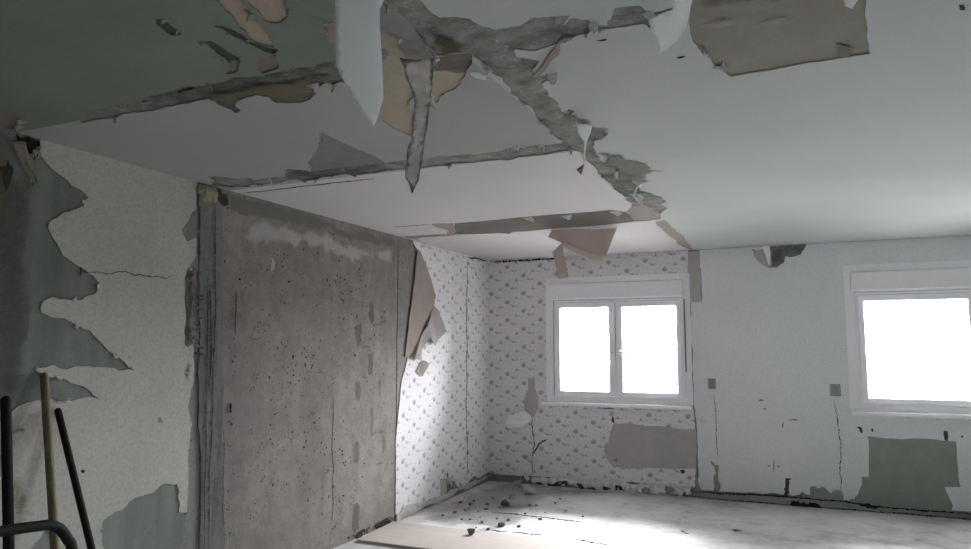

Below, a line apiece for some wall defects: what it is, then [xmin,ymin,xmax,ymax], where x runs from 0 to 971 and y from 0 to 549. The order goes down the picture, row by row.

spalling [197,40,242,73]
peeling [218,0,294,74]
peeling [379,0,472,135]
peeling [689,0,869,76]
peeling [0,130,134,410]
crack [80,267,171,279]
peeling [404,223,458,238]
peeling [752,244,806,268]
peeling [101,201,206,549]
peeling [603,423,697,474]
crack [676,405,971,520]
peeling [790,427,963,510]